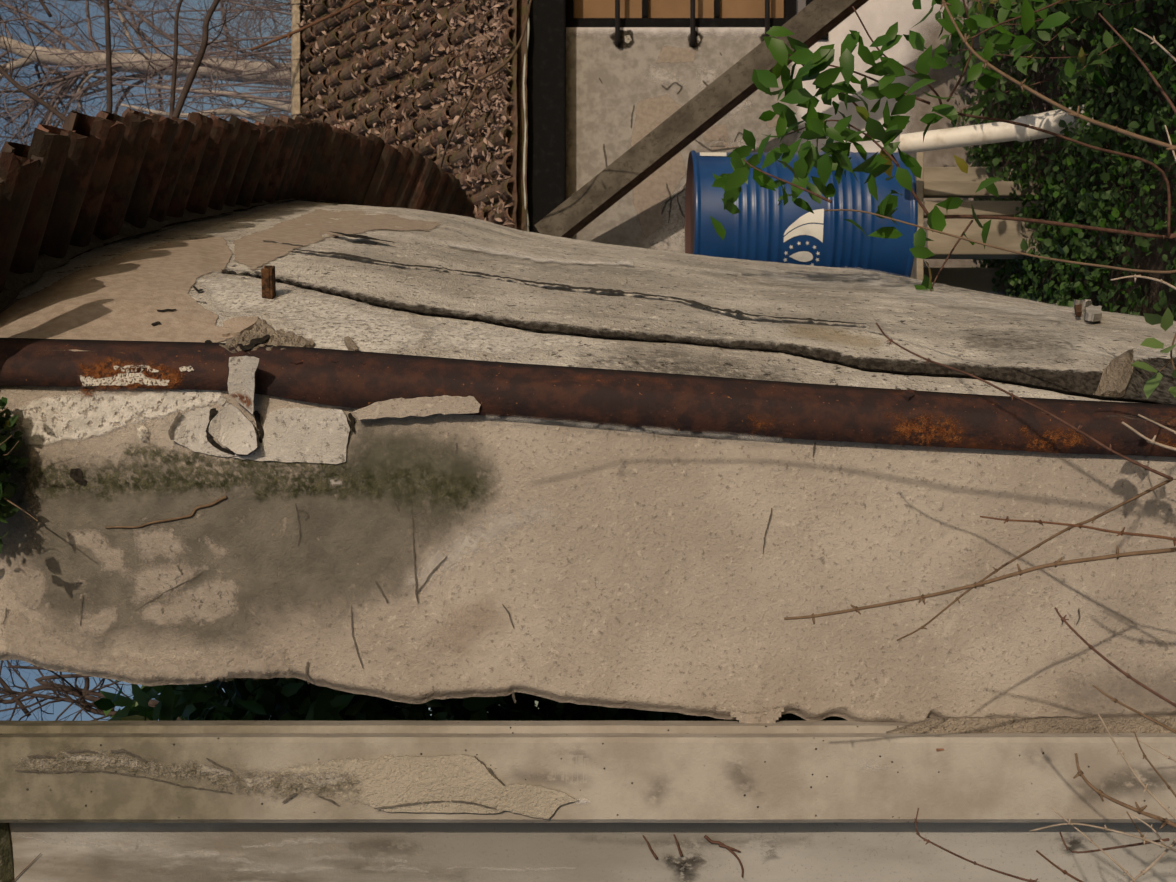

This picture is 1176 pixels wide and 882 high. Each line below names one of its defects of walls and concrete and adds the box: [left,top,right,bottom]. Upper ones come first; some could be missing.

rust [80,358,182,395]
peeling [0,209,443,464]
crack [221,231,1176,405]
rust [900,390,915,402]
rust [896,417,958,442]
damp [22,438,487,644]